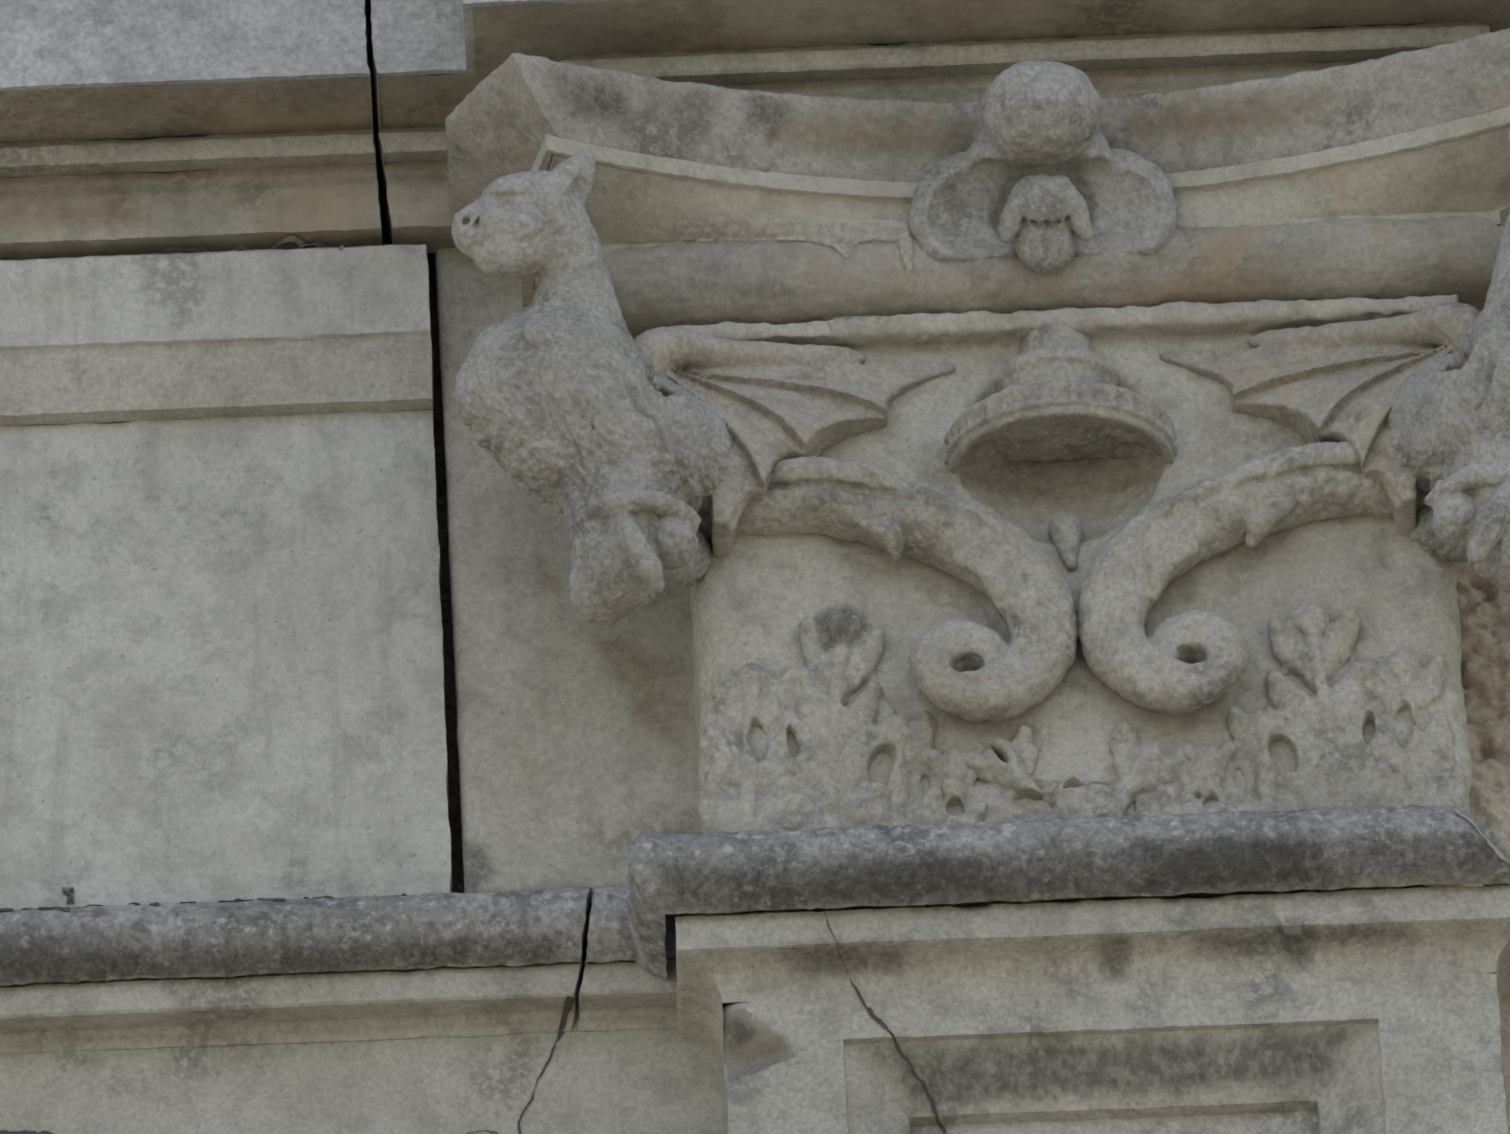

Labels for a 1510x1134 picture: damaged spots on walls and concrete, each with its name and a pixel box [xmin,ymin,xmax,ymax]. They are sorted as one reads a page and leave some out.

crack [0,1126,54,1134]
crack [466,996,576,1134]
crack [823,902,946,1134]